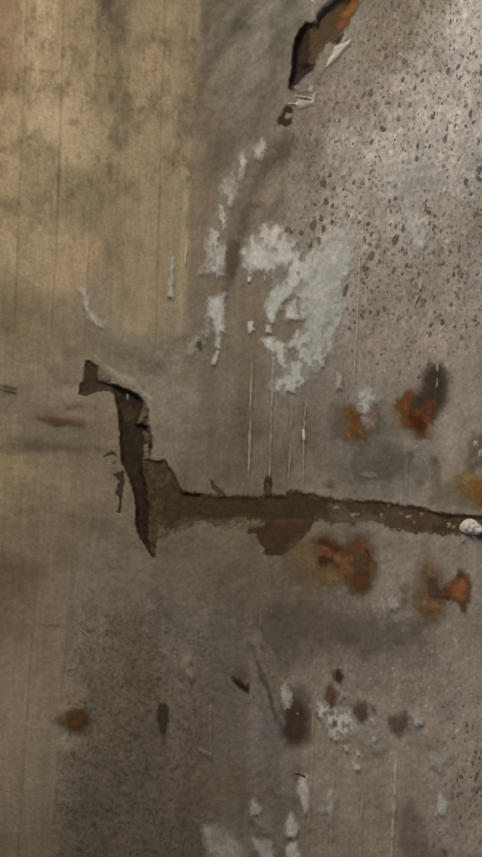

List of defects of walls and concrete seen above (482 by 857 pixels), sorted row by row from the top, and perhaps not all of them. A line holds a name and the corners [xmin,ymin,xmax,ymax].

spalling [277,0,362,126]
spalling [358,52,449,133]
spalling [446,47,482,90]
spalling [365,113,431,172]
water stain [205,138,355,392]
water stain [187,291,226,364]
rust [337,406,379,439]
rust [394,363,447,438]
crack [105,451,125,512]
crack [163,480,482,542]
rust [291,536,376,591]
rust [401,565,471,619]